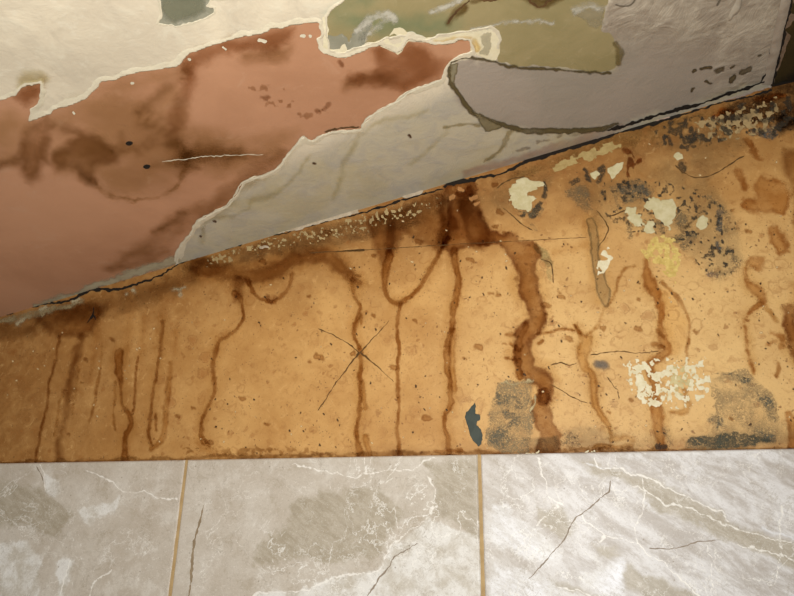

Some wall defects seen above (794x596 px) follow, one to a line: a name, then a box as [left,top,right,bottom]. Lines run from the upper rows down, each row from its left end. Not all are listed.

peeling [0,0,623,317]
crack [309,0,794,227]
leakage [692,65,752,84]
leakage [655,97,794,151]
leakage [473,227,508,246]
leakage [520,181,548,218]
leakage [565,165,738,277]
crack [8,245,241,323]
crack [318,322,393,410]
peeling [465,379,536,454]
crack [530,481,611,578]
crack [367,543,417,596]